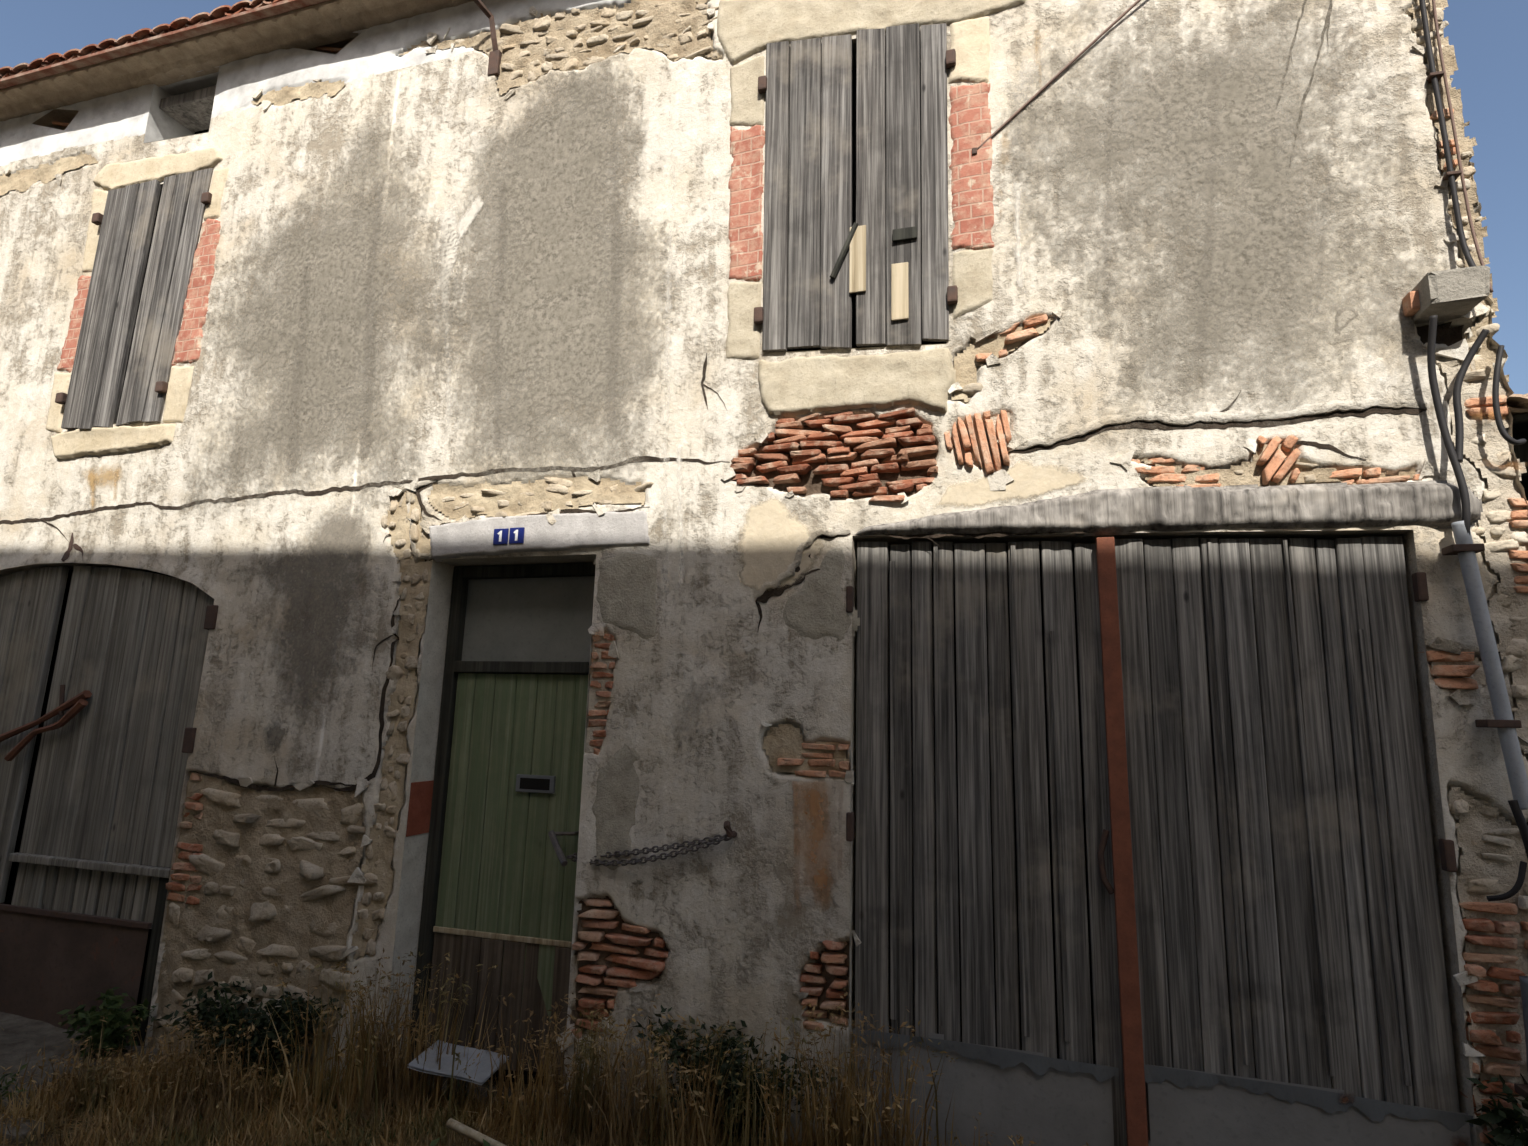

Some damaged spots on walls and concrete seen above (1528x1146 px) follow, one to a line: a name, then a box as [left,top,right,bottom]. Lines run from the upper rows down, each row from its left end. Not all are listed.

spalling [399,0,722,100]
spalling [0,152,98,196]
water stain [190,62,669,708]
spalling [721,311,1063,504]
crack [999,390,1427,460]
spalling [1110,435,1441,488]
spalling [1406,0,1528,754]
crack [0,456,727,791]
spalling [148,469,669,1076]
spalling [761,723,854,785]
spalling [793,930,862,1031]
spalling [1448,787,1528,1146]